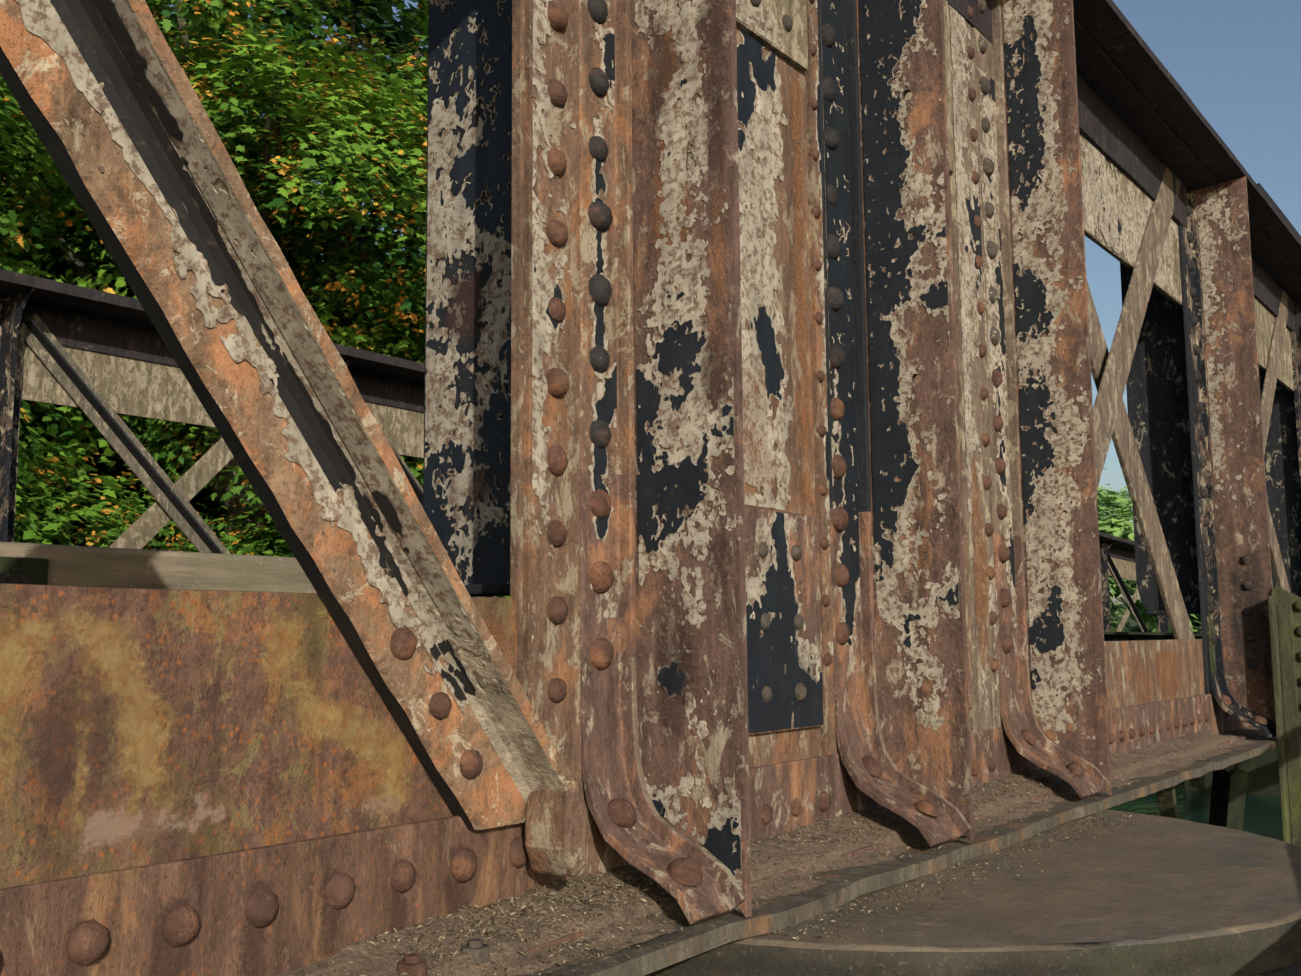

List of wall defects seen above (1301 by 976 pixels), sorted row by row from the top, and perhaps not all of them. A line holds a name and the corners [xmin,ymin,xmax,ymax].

peeling [14,0,512,724]
corrosion [448,274,482,338]
corrosion [468,468,496,503]
peeling [531,0,576,559]
peeling [591,158,608,203]
peeling [590,225,610,282]
peeling [584,295,617,543]
peeling [593,19,615,140]
peeling [634,0,1153,749]
peeling [1154,219,1182,302]
peeling [1197,188,1260,509]
peeling [644,644,742,887]